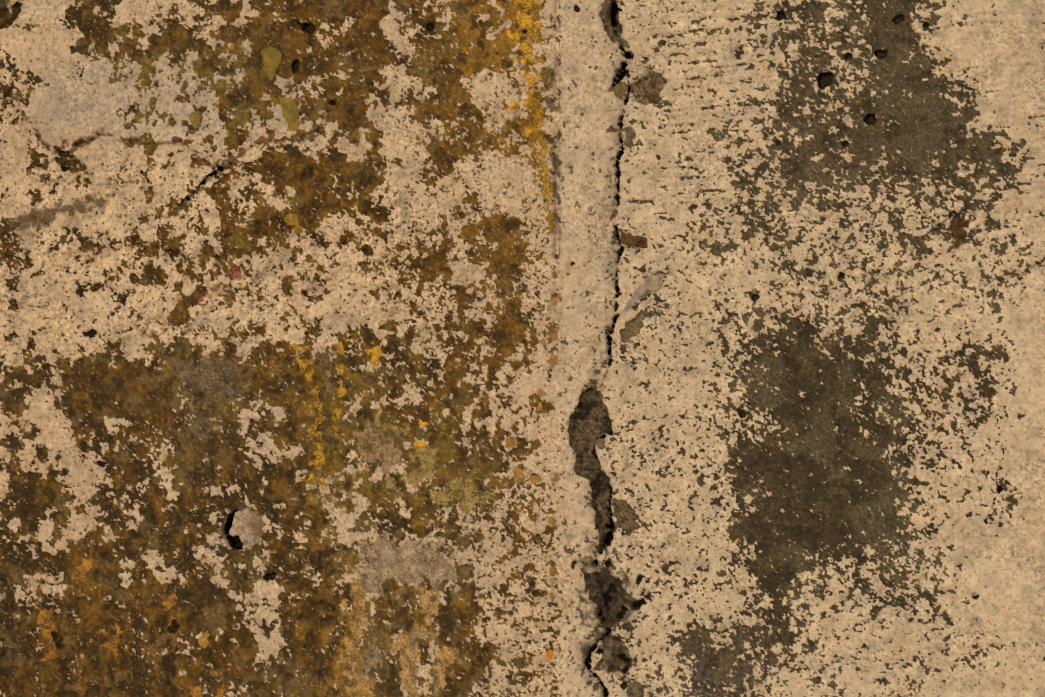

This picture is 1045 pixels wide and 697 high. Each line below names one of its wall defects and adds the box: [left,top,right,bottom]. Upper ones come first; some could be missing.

damp [506,0,559,247]
crack [180,162,230,203]
crack [607,0,651,366]
damp [366,345,382,366]
damp [291,339,354,489]
damp [353,409,496,515]
crack [594,524,614,567]
damp [35,606,73,697]
damp [98,624,122,656]
damp [159,593,202,697]
damp [335,528,462,697]
crack [584,609,614,697]